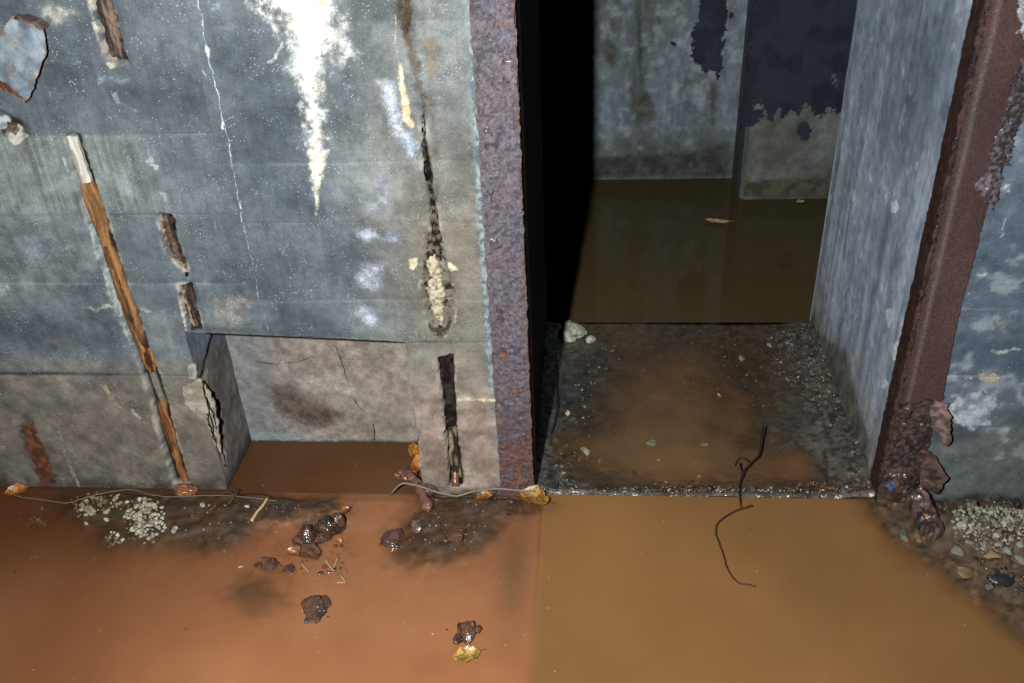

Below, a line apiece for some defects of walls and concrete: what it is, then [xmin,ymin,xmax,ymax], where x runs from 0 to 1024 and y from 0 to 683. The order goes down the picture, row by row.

spalling [88,0,116,69]
rust [501,57,516,84]
crack [197,0,268,329]
efflorescence [246,0,356,215]
peeling [797,121,812,140]
crack [408,114,459,337]
rust [19,423,56,486]